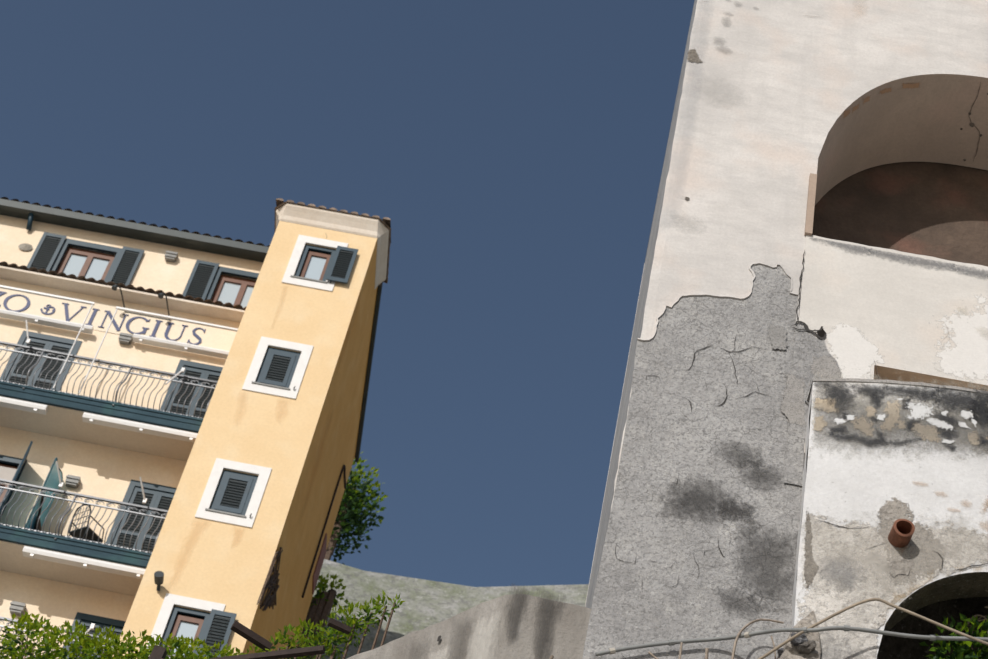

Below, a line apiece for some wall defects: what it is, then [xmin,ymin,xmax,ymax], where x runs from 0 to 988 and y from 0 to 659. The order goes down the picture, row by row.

crack [969,82,981,161]
crack [646,337,768,411]
flaking render [582,262,988,659]
leakage [670,483,751,518]